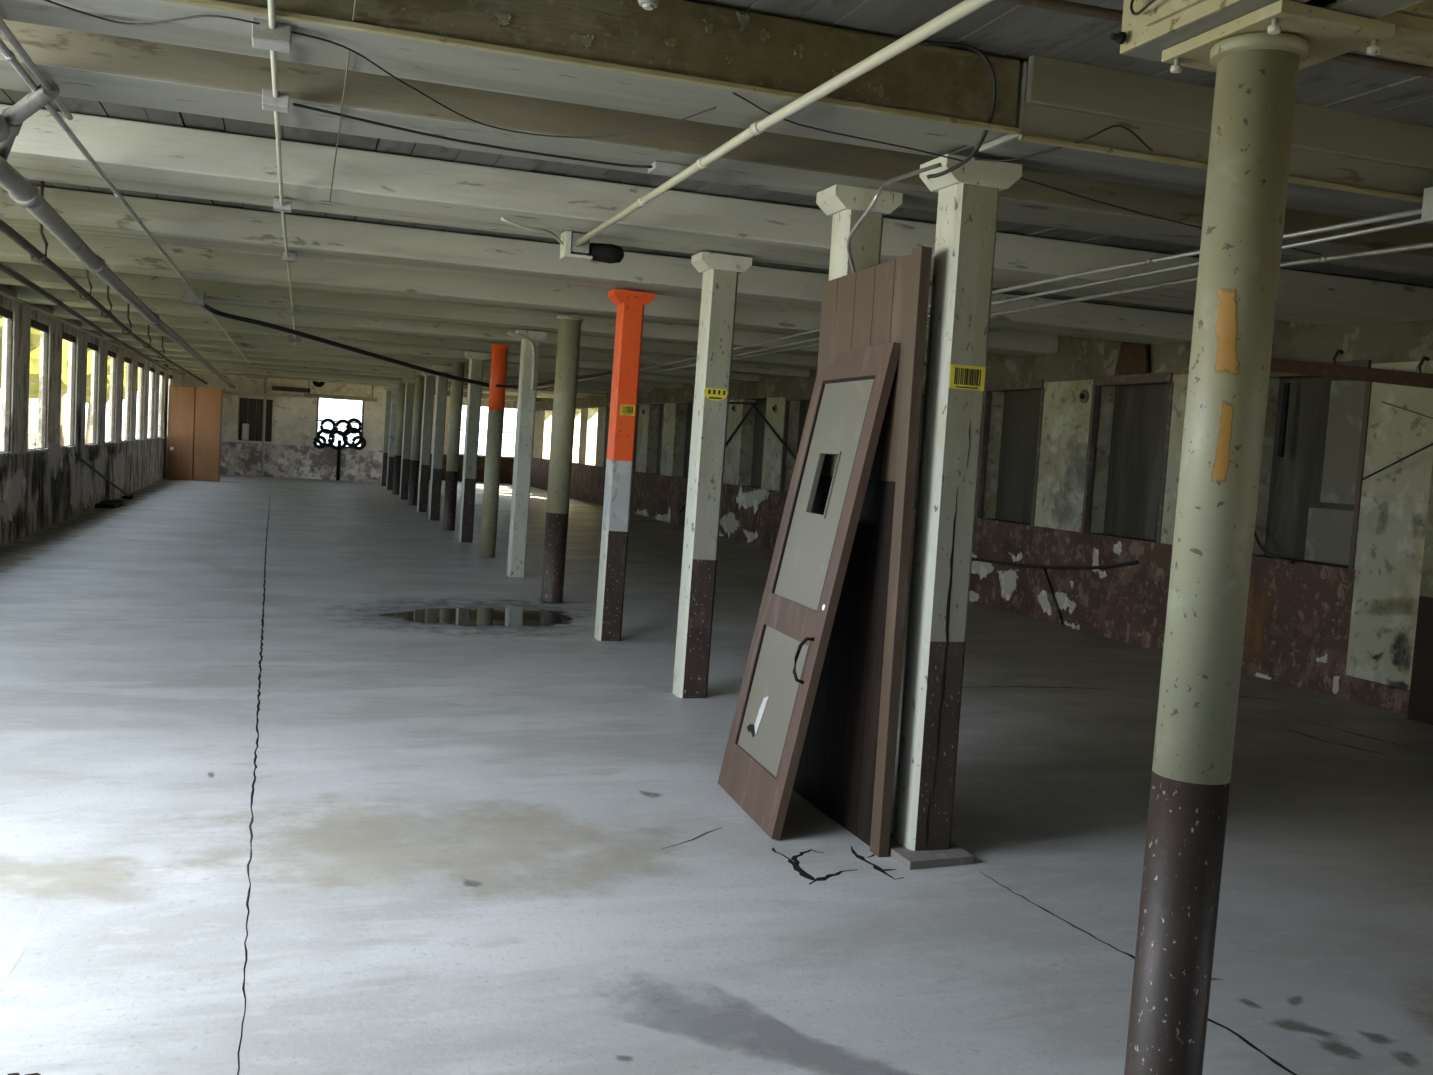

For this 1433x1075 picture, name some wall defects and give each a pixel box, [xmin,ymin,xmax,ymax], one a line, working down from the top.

water stain [0,407,116,539]
peeling [635,506,671,523]
peeling [719,486,771,543]
crack [925,420,971,848]
peeling [969,552,1022,602]
peeling [1037,581,1080,630]
peeling [1092,541,1122,579]
crack [237,498,270,1075]
crack [772,846,904,884]
water stain [648,998,903,1075]